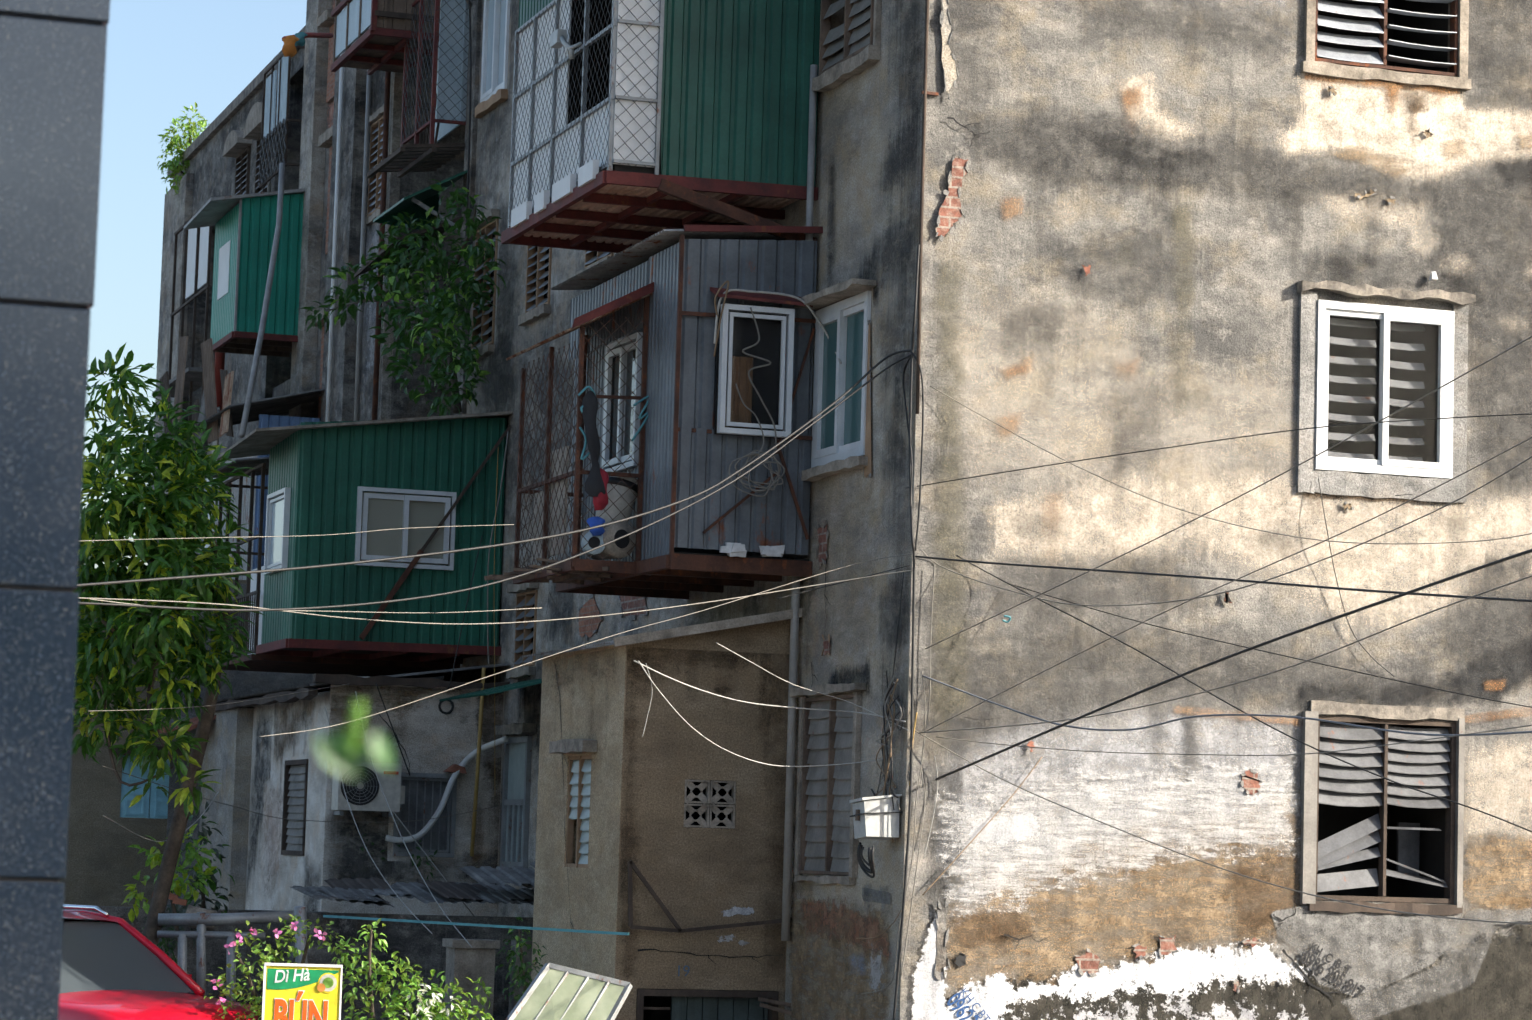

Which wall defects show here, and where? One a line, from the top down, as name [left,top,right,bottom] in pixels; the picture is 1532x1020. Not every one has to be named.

leakage [1468,0,1532,101]
flaking render [935,153,970,242]
leakage [977,113,1532,484]
flaking render [940,714,1294,885]
leakage [946,785,1301,987]
leakage [1463,835,1532,917]
peeling [911,898,1314,1020]